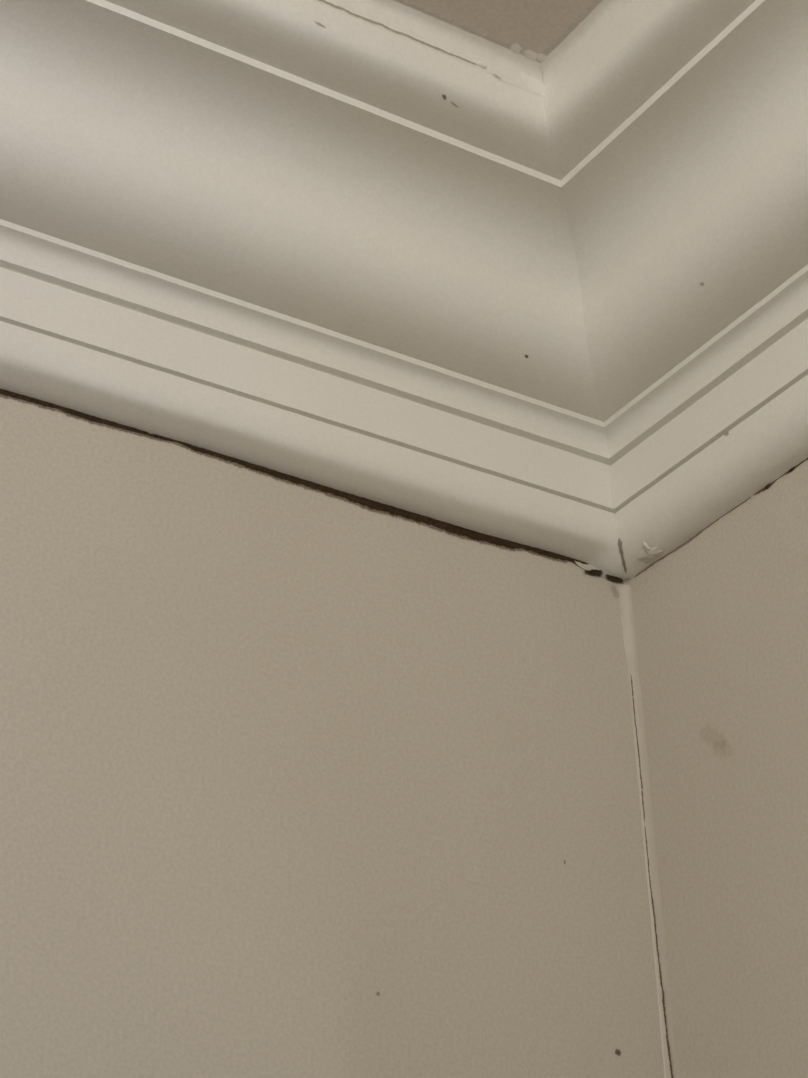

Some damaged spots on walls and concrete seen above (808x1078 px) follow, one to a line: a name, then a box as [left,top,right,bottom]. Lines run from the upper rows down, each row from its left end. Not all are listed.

crack [0,389,588,567]
crack [619,458,808,577]
crack [631,676,673,1078]